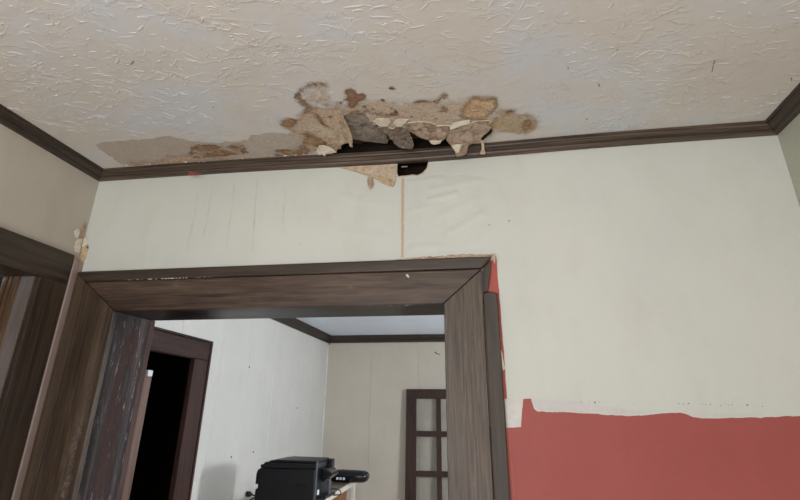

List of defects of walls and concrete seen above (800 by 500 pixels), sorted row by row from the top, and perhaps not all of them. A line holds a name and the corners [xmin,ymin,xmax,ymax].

flaking render [316,113,492,157]
spalling [396,162,429,177]
peeling [74,222,89,263]